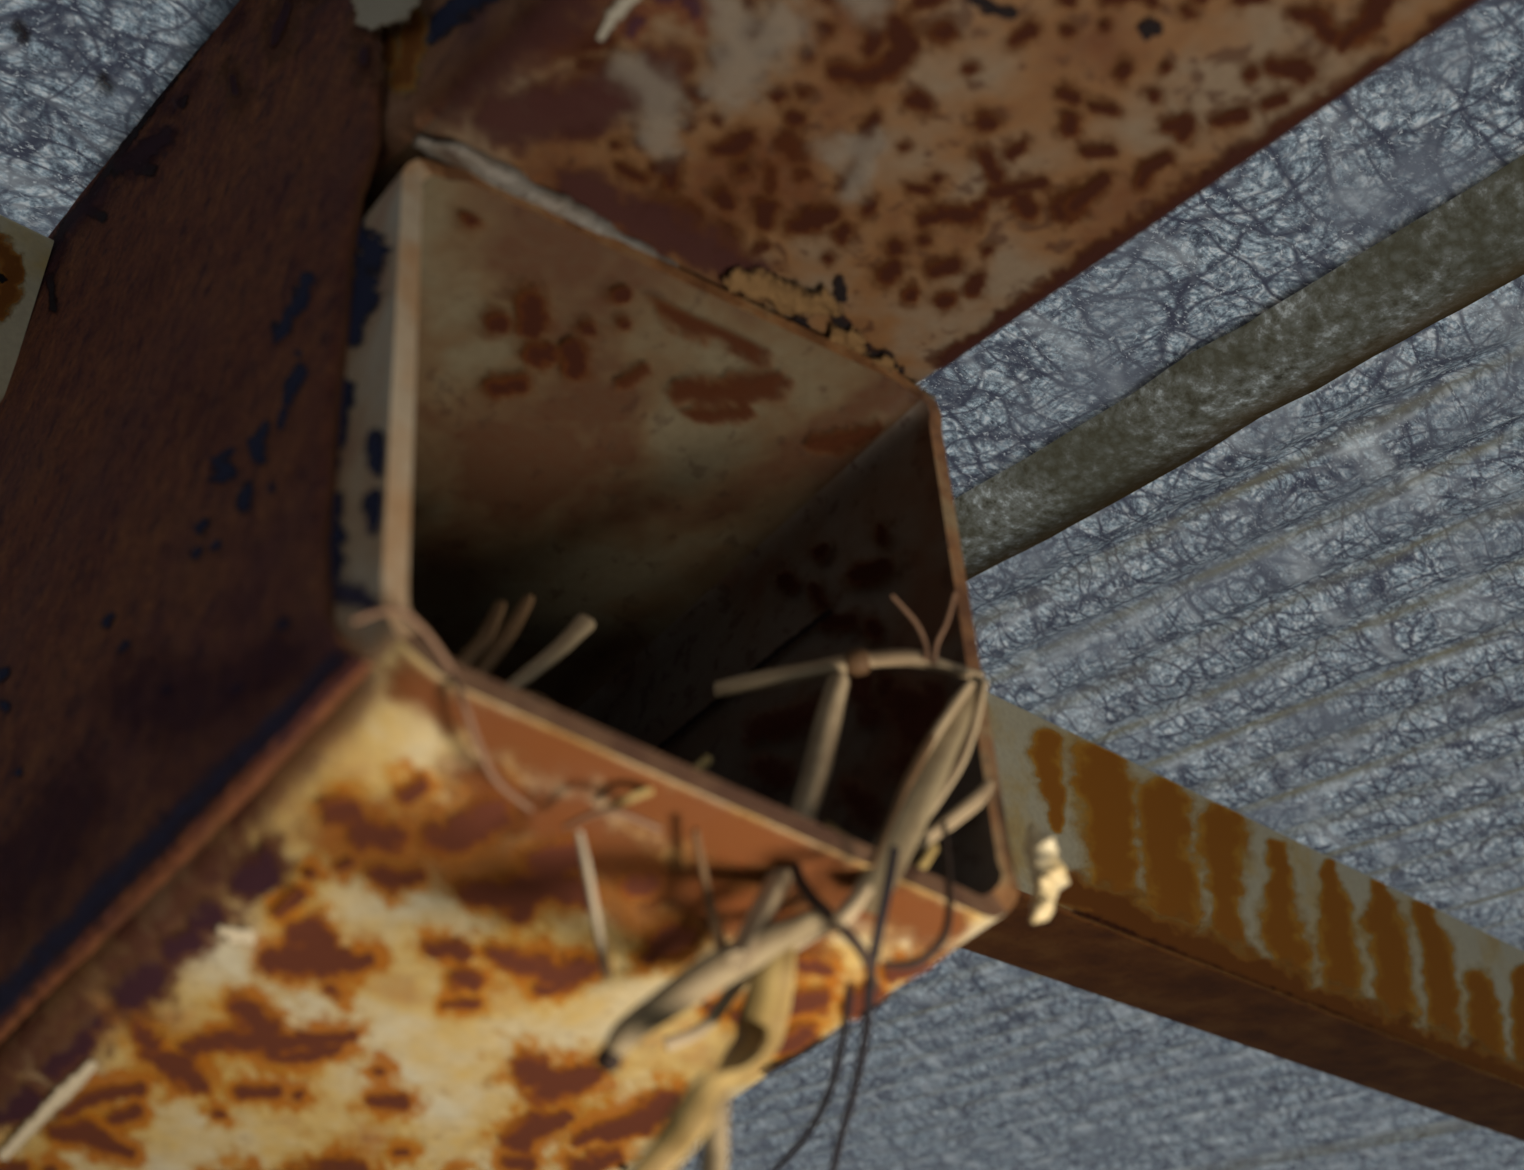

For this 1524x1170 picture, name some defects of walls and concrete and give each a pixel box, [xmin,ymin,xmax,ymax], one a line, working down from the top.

peeling [350,0,498,45]
corrosion [0,11,244,321]
peeling [208,270,315,514]
peeling [330,379,385,612]
peeling [348,207,393,348]
corrosion [431,0,881,291]
corrosion [875,81,1122,312]
corrosion [933,0,1482,370]
corrosion [848,673,945,779]
corrosion [0,657,863,1170]
corrosion [763,883,969,1076]
corrosion [1027,727,1524,1087]